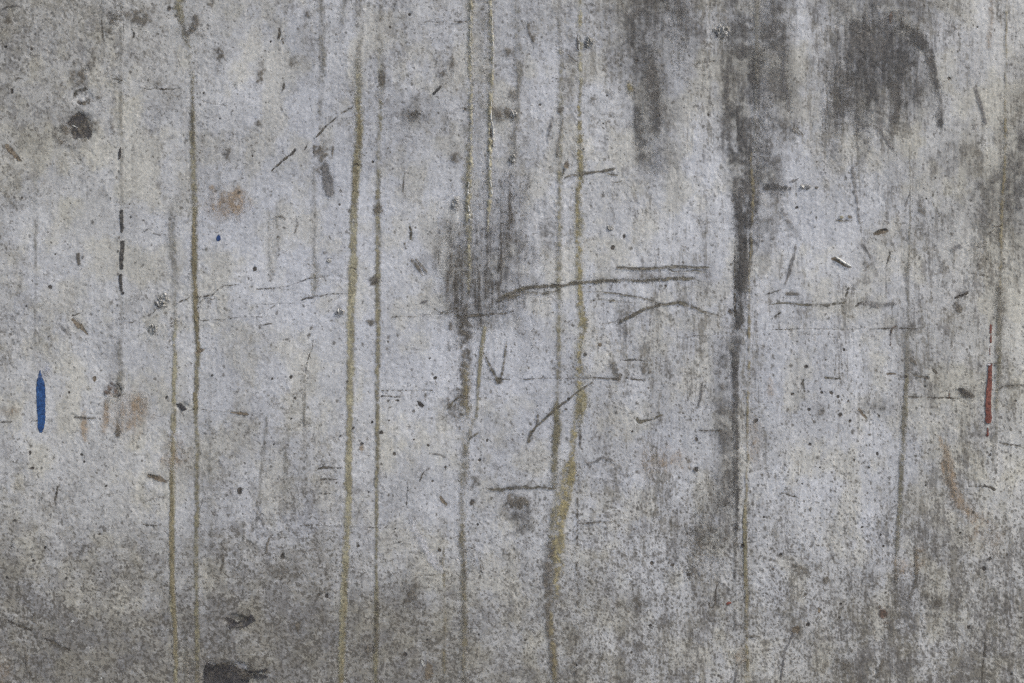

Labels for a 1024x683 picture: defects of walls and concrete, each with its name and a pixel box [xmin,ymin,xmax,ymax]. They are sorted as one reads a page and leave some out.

damp [618,0,667,161]
damp [829,0,940,140]
damp [438,177,521,418]
damp [719,0,788,683]
damp [459,502,467,667]